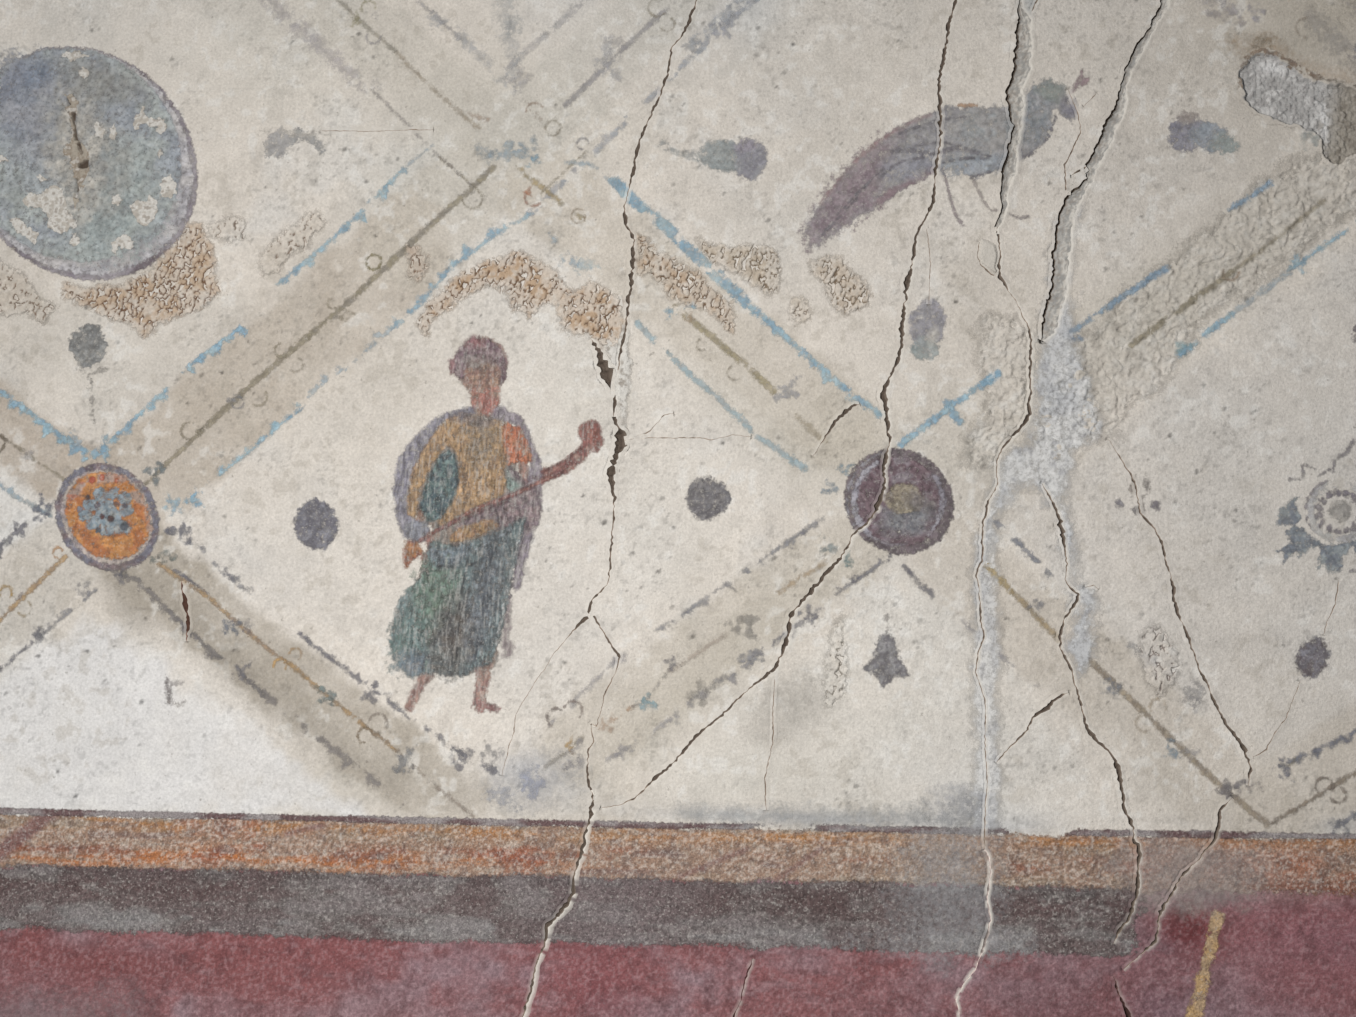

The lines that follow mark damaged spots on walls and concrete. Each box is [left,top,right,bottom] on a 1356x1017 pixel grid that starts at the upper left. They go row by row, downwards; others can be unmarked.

spalling [0,215,246,339]
spalling [258,208,327,277]
spalling [415,250,633,427]
spalling [636,233,812,335]
spalling [806,253,874,316]
peeling [958,47,1356,468]
crack [498,0,963,1017]
crack [952,0,1304,1017]